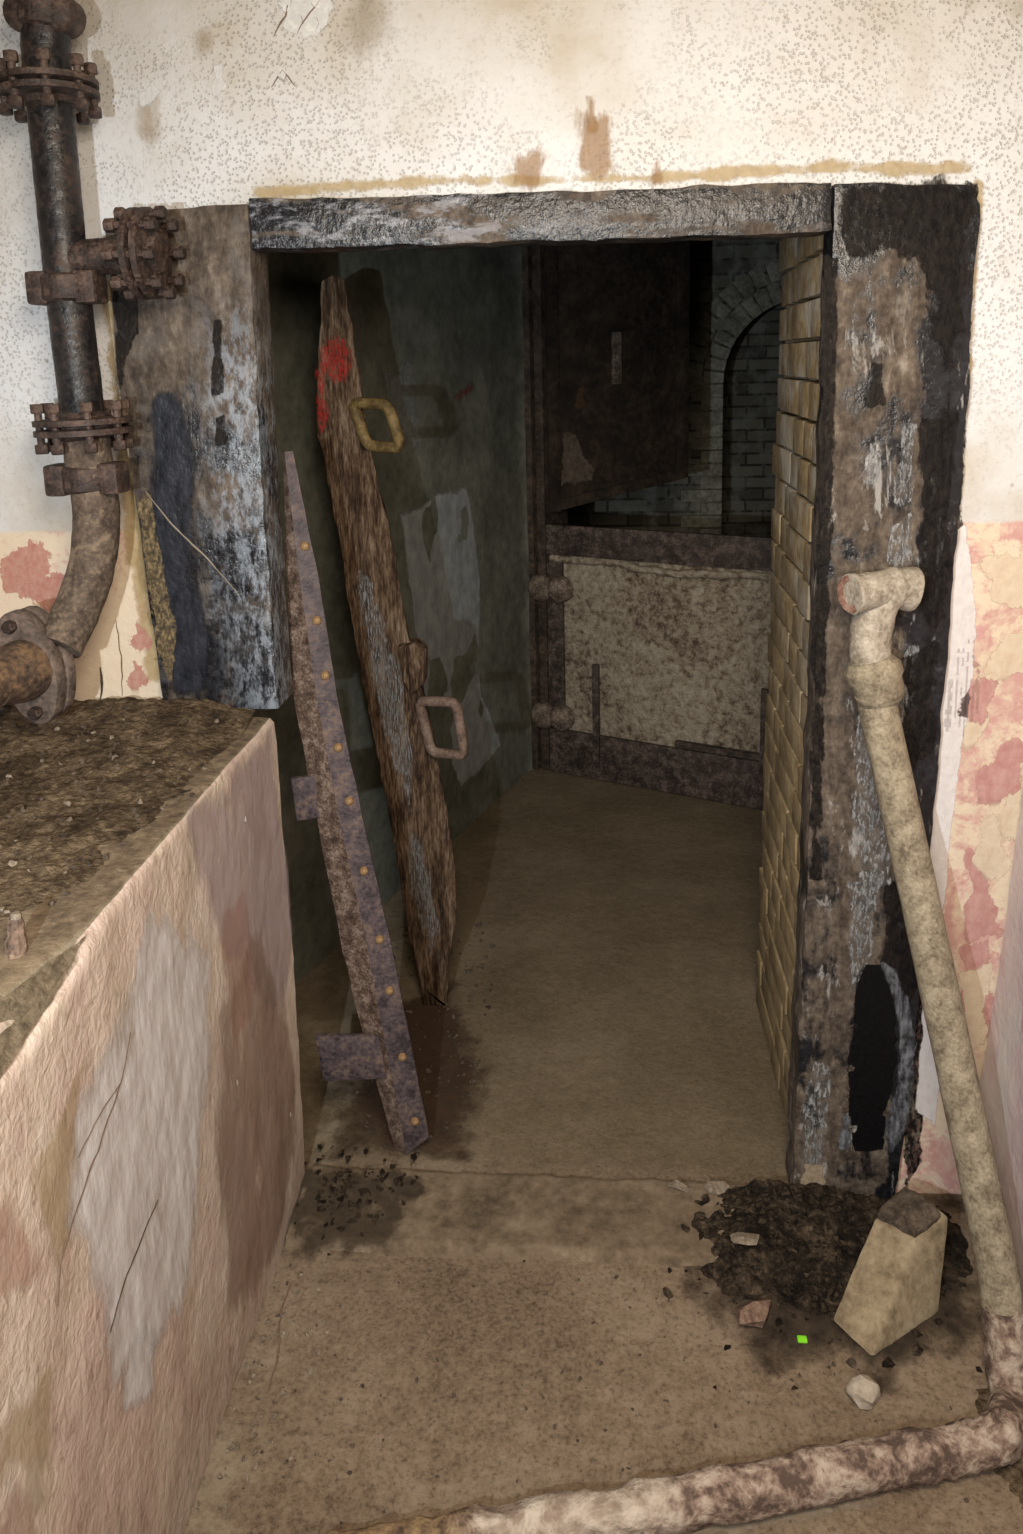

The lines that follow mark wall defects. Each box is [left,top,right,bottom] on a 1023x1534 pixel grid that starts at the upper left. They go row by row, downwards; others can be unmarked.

peeling [274,0,334,40]
damp [255,175,554,197]
corrosion [517,152,544,187]
corrosion [580,101,610,176]
damp [583,161,983,212]
peeling [0,539,64,612]
peeling [126,621,153,689]
peeling [930,525,1023,1050]
peeling [916,1011,939,1125]